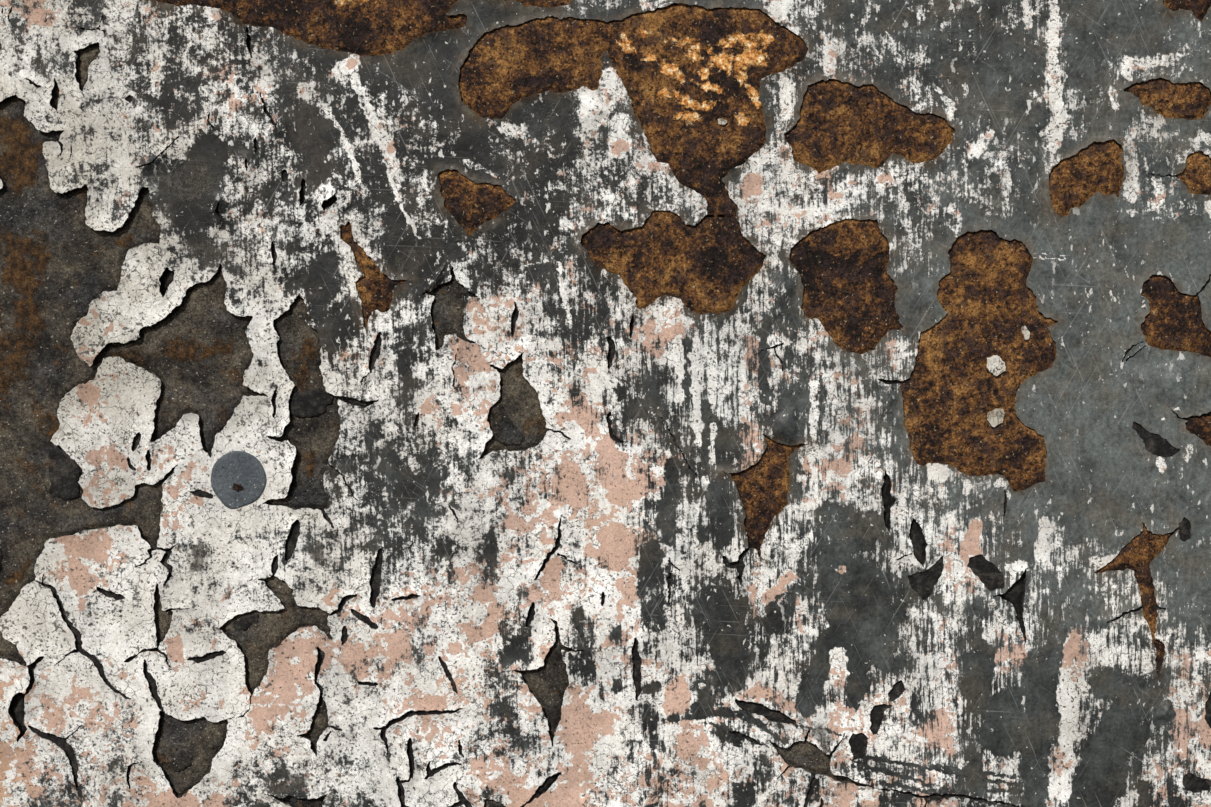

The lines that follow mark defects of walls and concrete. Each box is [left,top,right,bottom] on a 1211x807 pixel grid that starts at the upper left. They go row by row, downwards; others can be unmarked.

rust [458,0,808,314]
rust [784,79,955,174]
peeling [0,95,268,667]
peeling [262,295,379,510]
rust [789,218,903,354]
rust [900,230,1058,492]
peeling [152,708,229,798]
peeling [216,576,333,756]
crack [358,679,378,687]
crack [373,656,472,807]
crack [631,637,642,701]
crack [729,698,845,807]